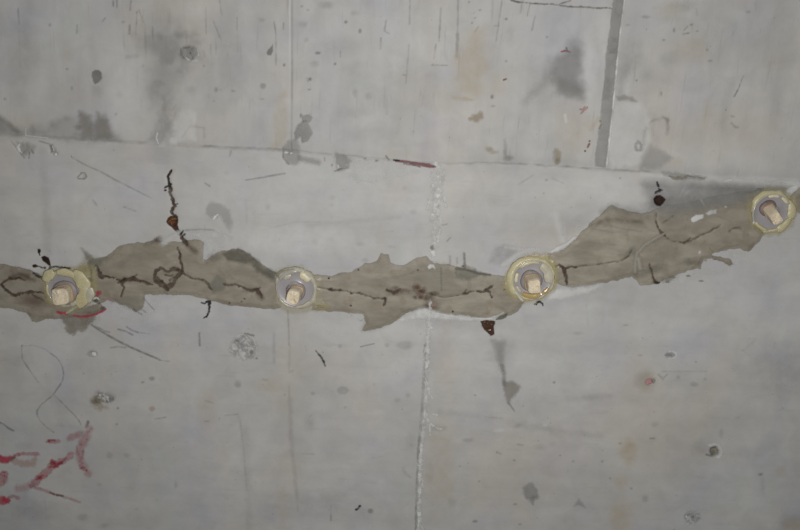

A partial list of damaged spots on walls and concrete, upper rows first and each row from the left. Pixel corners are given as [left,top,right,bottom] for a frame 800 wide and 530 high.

crack [96,170,262,318]
crack [0,266,71,299]
crack [318,278,400,306]
crack [555,264,577,284]